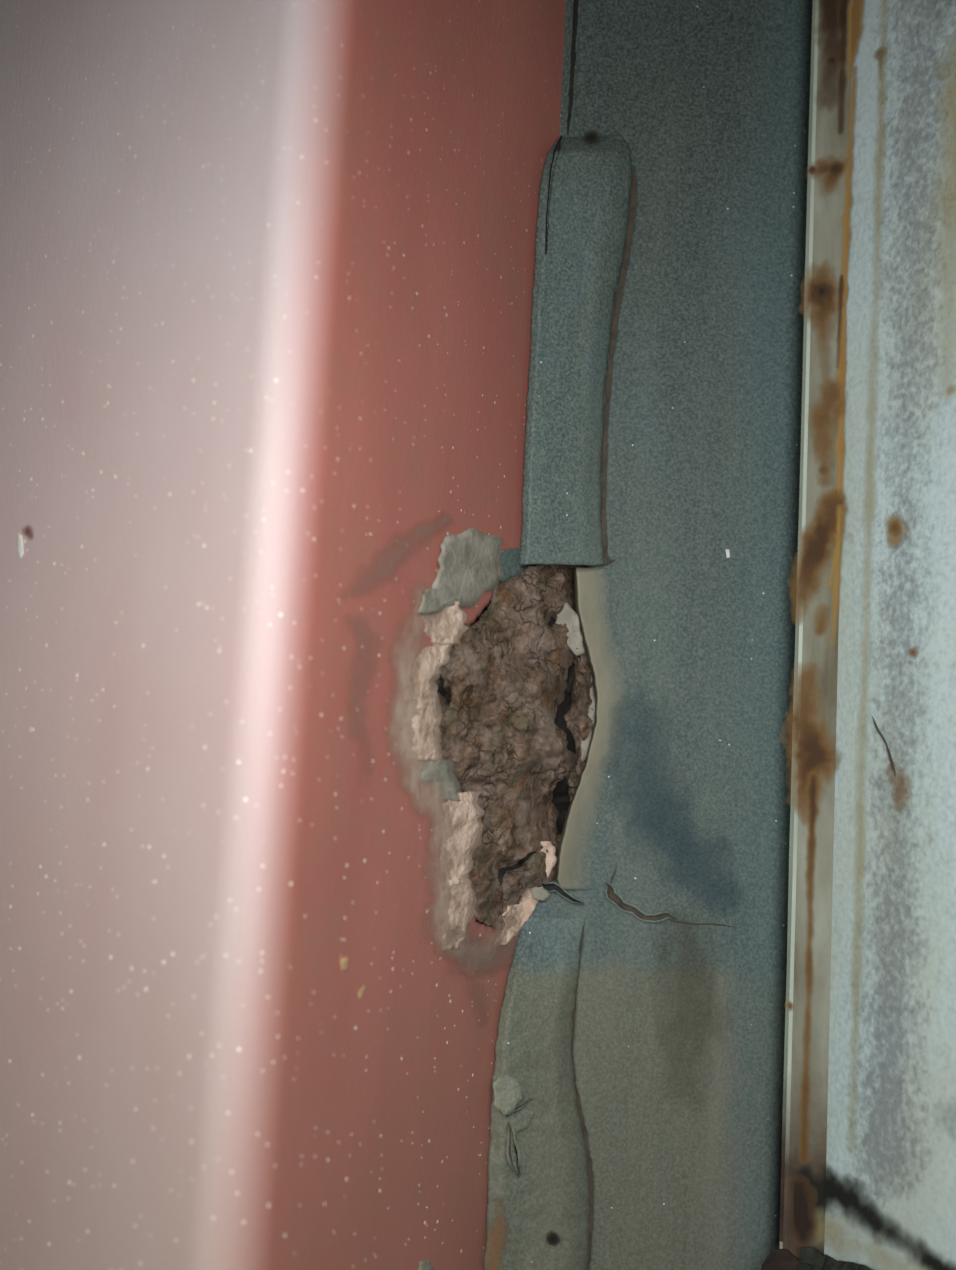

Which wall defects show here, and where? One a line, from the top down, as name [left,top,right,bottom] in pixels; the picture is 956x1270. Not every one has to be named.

corrosion [792,0,864,634]
corrosion [888,517,903,545]
spalling [391,565,630,960]
crack [530,863,732,927]
corrosion [786,669,835,1162]
corrosion [793,1178,815,1245]